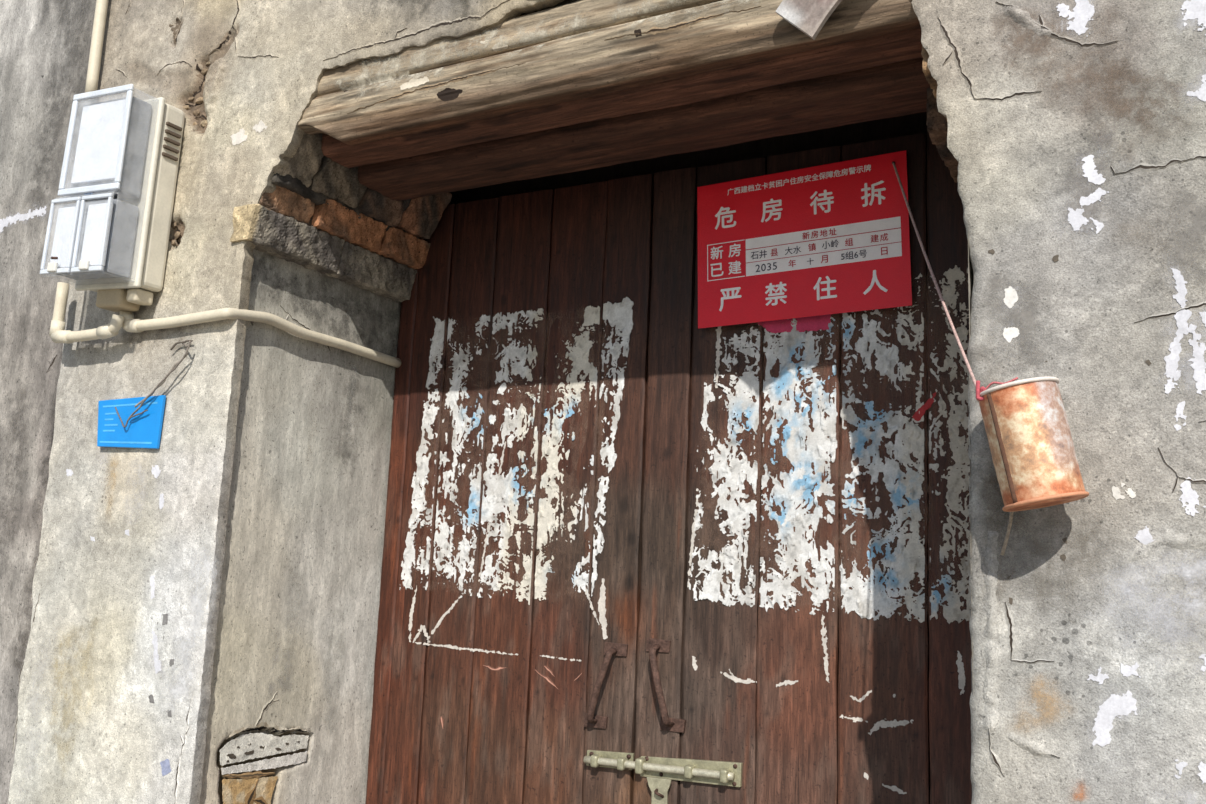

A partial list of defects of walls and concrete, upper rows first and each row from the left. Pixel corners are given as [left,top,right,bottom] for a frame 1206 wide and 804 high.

crack [157,0,279,76]
crack [937,17,1042,102]
crack [995,1,1118,50]
peeling [1056,0,1095,37]
peeling [0,206,47,233]
peeling [1067,155,1109,234]
crack [1110,155,1206,175]
peeling [1145,267,1206,431]
crack [1158,447,1206,492]
crack [1004,602,1054,664]
peeling [1087,662,1141,747]
flaking render [222,776,278,804]